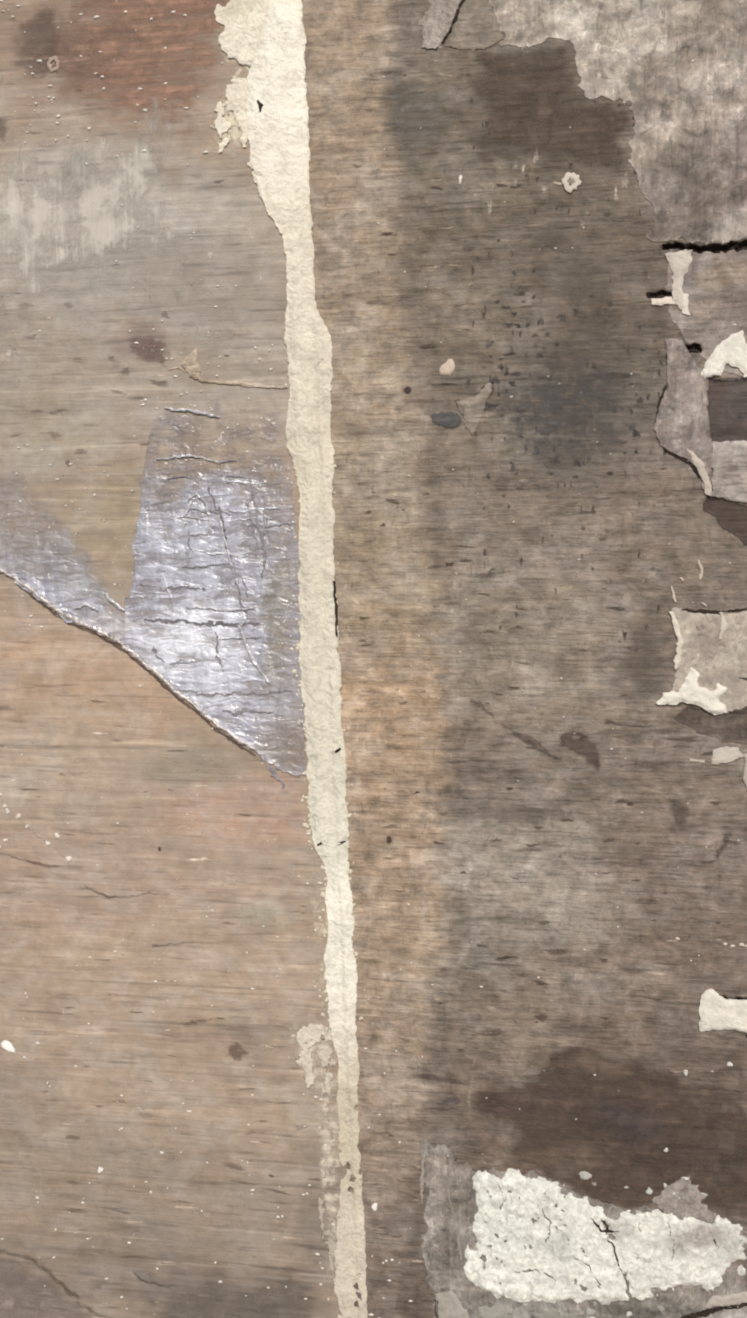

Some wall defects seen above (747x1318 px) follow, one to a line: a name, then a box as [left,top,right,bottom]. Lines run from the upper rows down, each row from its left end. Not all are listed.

damp [474,51,627,165]
peeling [553,172,582,194]
crack [662,240,747,253]
peeling [651,249,693,316]
peeling [701,331,747,378]
peeling [690,746,747,787]
peeling [699,989,747,1033]
damp [477,1047,747,1212]
peeling [646,1177,717,1224]
crack [514,1191,675,1286]
peeling [435,1290,511,1318]
peeling [705,1265,747,1308]